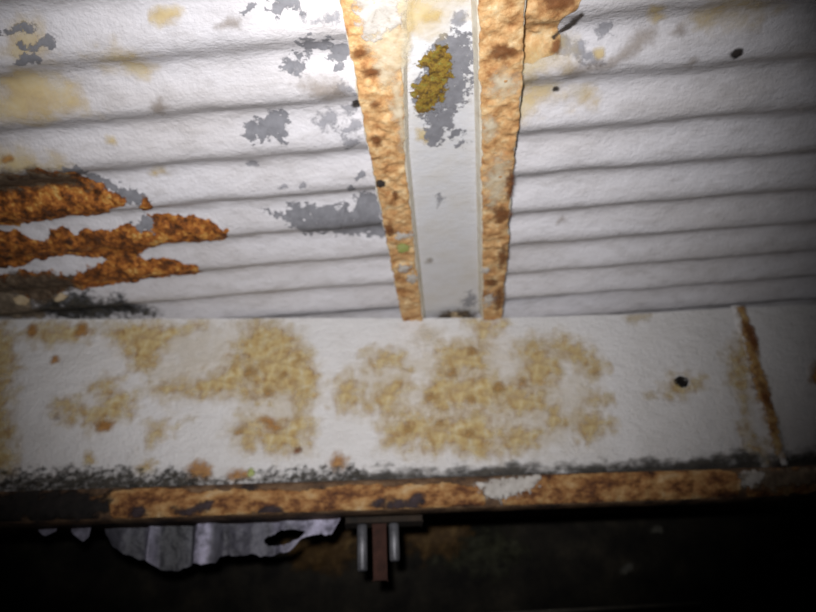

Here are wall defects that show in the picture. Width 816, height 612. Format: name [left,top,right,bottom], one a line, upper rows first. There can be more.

peeling [0,21,56,66]
peeling [279,32,350,77]
peeling [242,109,291,145]
peeling [312,105,362,149]
corrosion [340,0,581,339]
peeling [264,171,386,238]
corrosion [0,164,229,305]
corrosion [730,306,785,457]
corrosion [91,469,486,519]
leakage [0,449,816,492]
peeling [476,474,541,503]
corrosion [502,466,816,505]